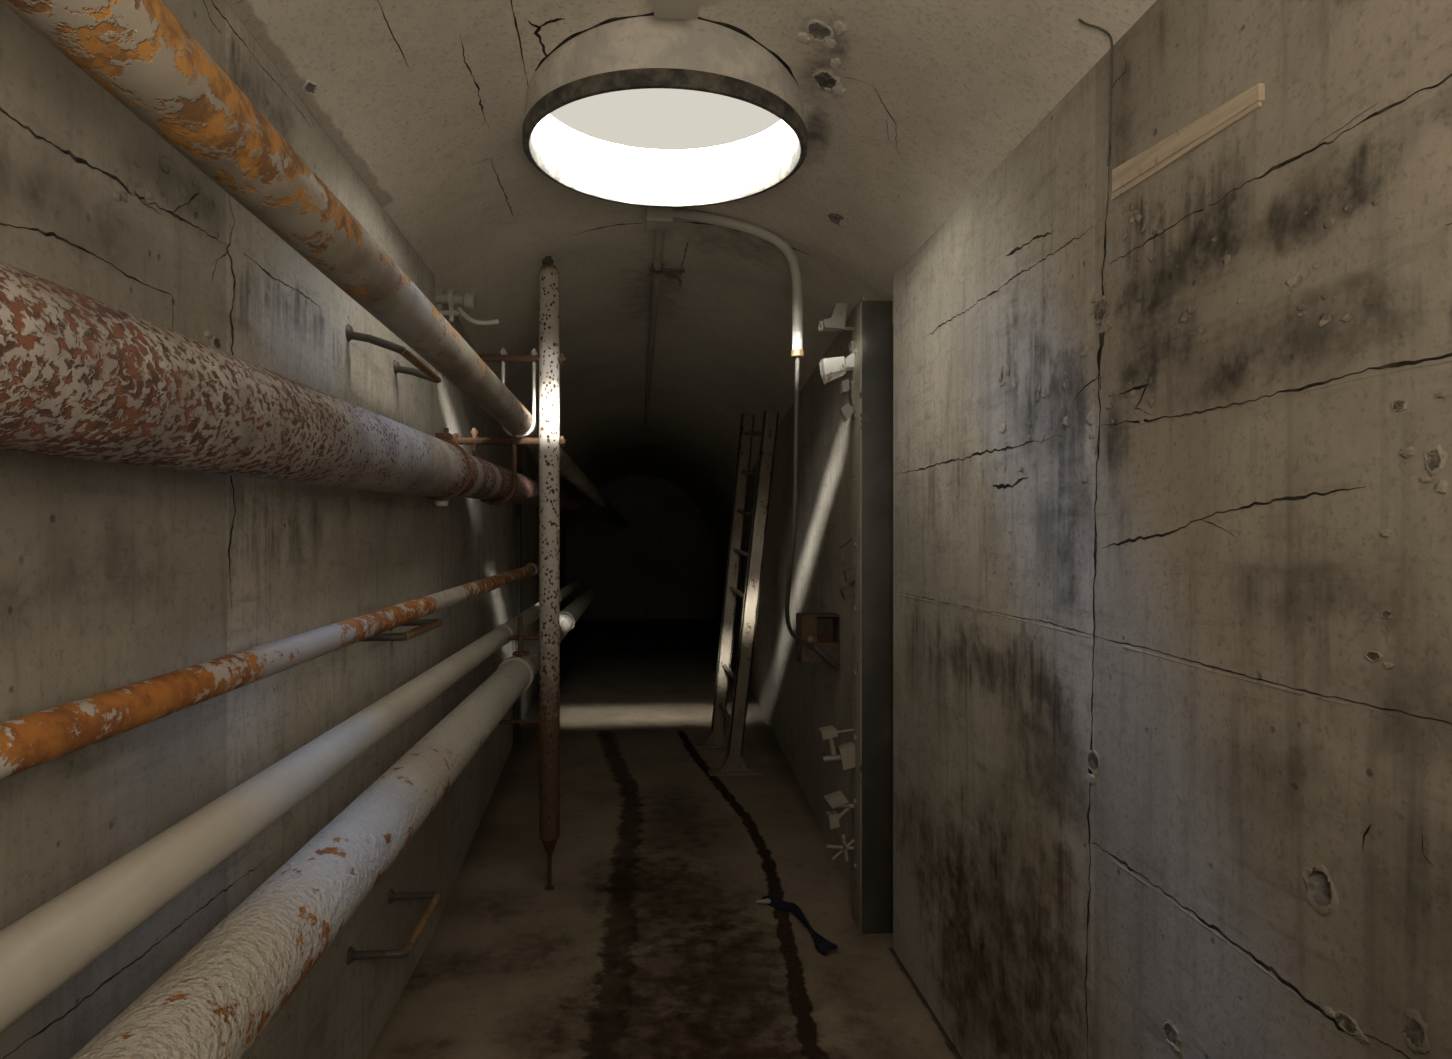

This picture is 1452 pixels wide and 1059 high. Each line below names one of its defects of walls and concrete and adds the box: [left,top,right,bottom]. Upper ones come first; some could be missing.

crack [203,0,311,127]
crack [377,0,409,67]
crack [460,36,513,215]
crack [510,0,654,85]
crack [698,17,799,86]
crack [844,77,899,153]
crack [0,107,319,356]
crack [679,222,741,277]
crack [228,475,236,605]
crack [896,73,1452,1059]
water stain [649,731,829,1059]
water stain [890,948,962,1059]